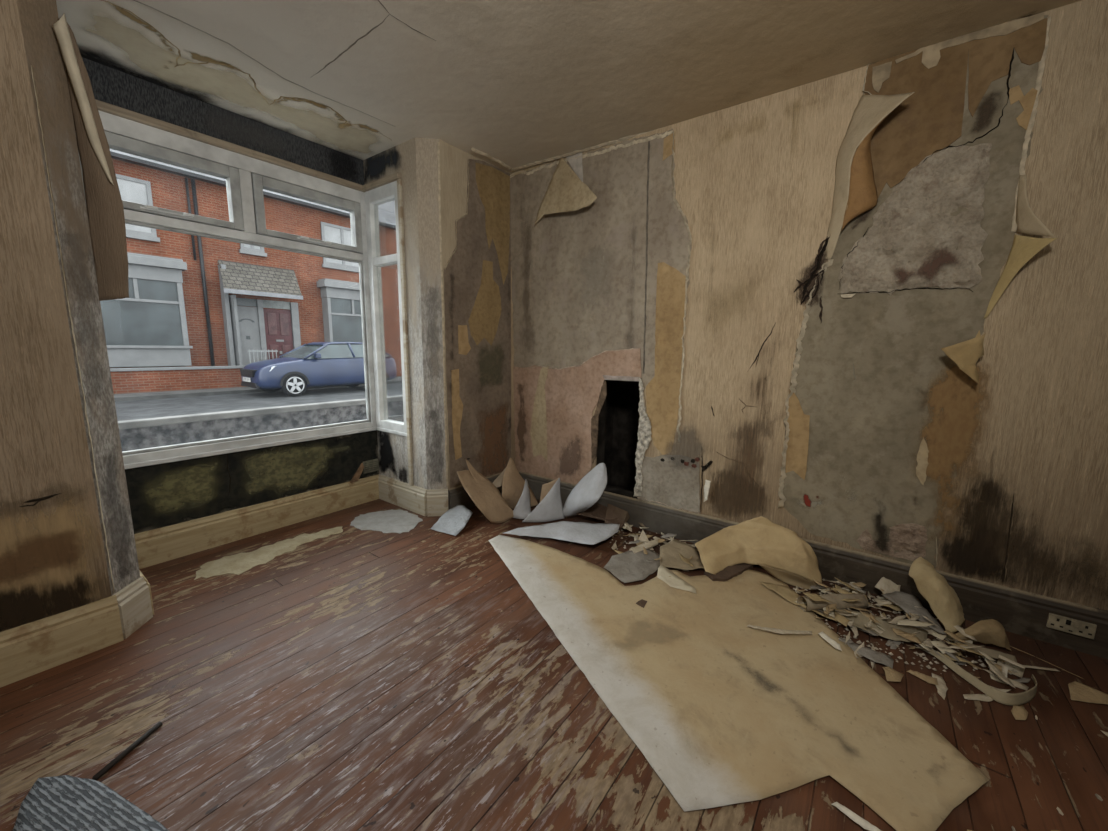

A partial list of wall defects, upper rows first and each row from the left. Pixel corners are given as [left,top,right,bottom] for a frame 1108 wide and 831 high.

crack [133,0,436,126]
damp [794,236,830,323]
spalling [838,143,992,298]
damp [0,500,91,632]
damp [125,430,407,534]
flaking render [513,348,699,514]
damp [875,512,888,551]
damp [936,480,1101,592]